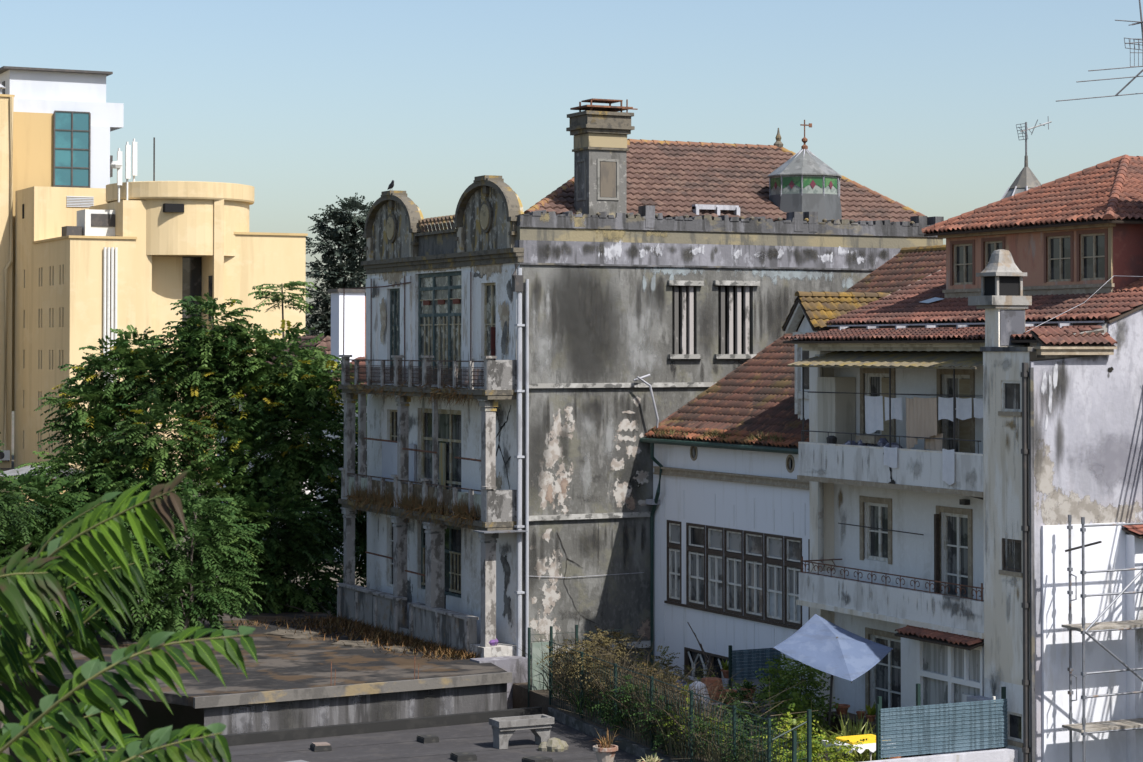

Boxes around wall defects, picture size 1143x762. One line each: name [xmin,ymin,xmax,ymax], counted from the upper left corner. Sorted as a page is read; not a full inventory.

peeling [531,406,577,515]
peeling [607,396,649,510]
peeling [500,544,512,628]
damp [529,535,559,578]
peeling [529,528,563,642]
damp [581,527,645,563]